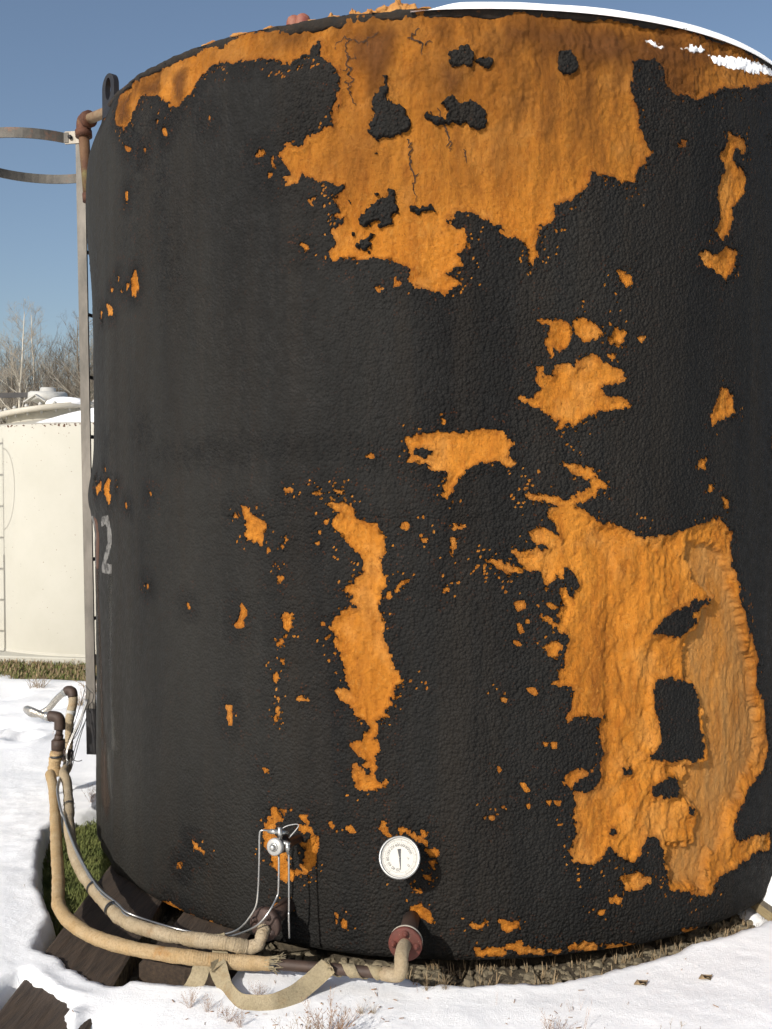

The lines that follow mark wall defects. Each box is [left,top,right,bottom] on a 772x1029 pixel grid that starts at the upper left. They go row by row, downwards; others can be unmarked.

peeling [104,9,772,297]
peeling [101,270,139,318]
peeling [96,468,118,505]
peeling [230,505,289,584]
peeling [266,612,310,729]
peeling [284,479,428,801]
peeling [398,300,770,920]
peeling [255,807,323,886]
peeling [379,820,440,924]
peeling [461,916,634,958]